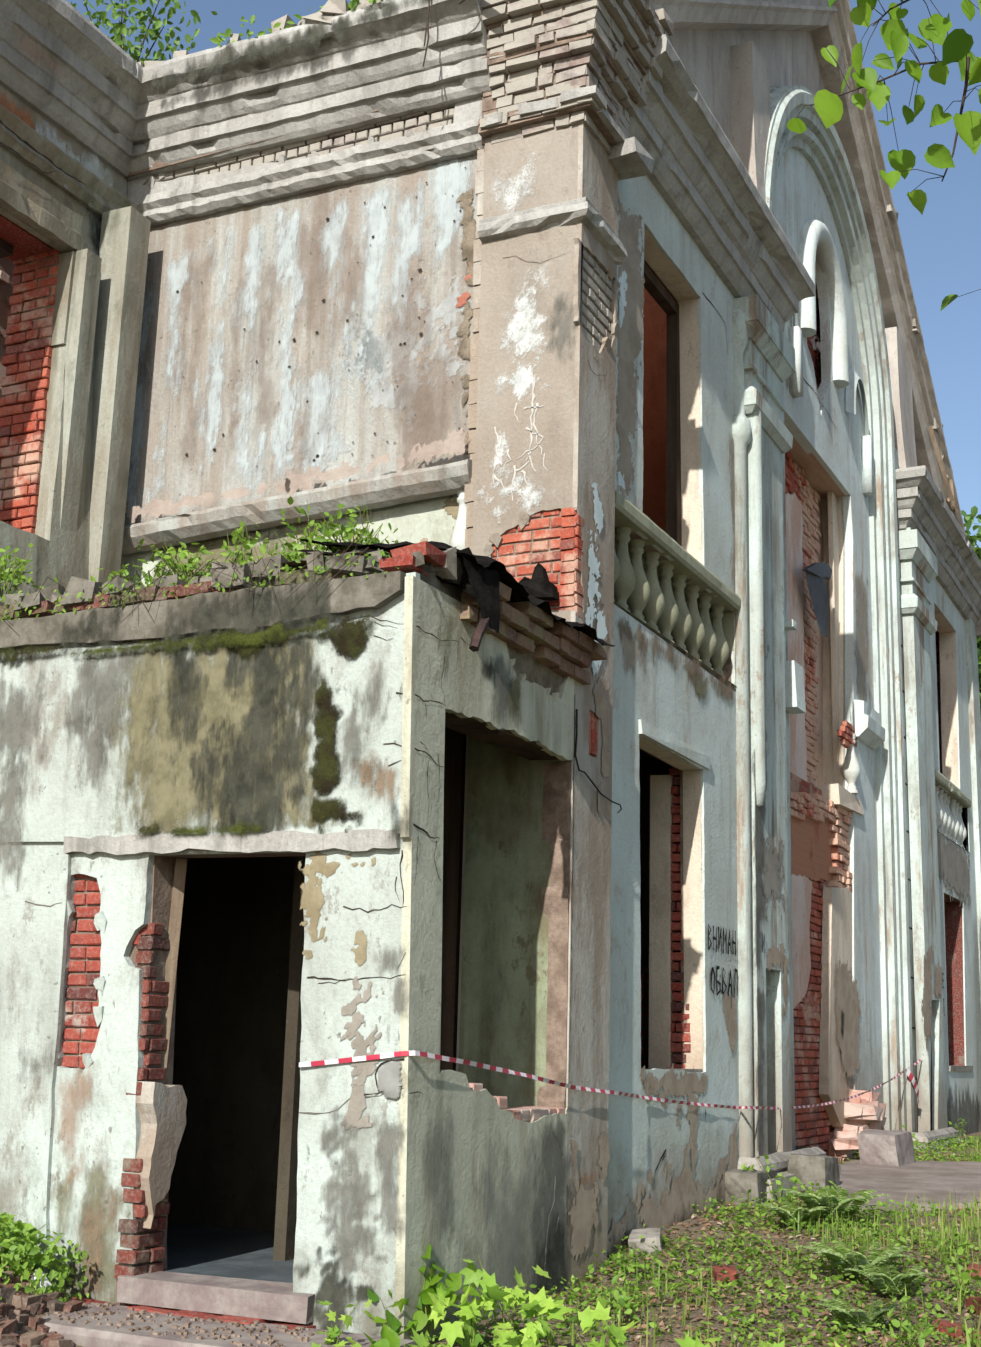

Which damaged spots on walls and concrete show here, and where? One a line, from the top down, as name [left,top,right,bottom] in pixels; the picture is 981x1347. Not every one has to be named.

damp [152,0,428,89]
damp [126,256,189,525]
damp [195,158,470,489]
spalling [478,0,674,497]
flaking render [61,874,107,1069]
damp [62,576,334,833]
flaking render [298,851,376,959]
crack [307,954,406,984]
damp [342,677,409,838]
flaking render [483,483,611,813]
spalling [790,791,853,892]
crack [299,1098,350,1114]